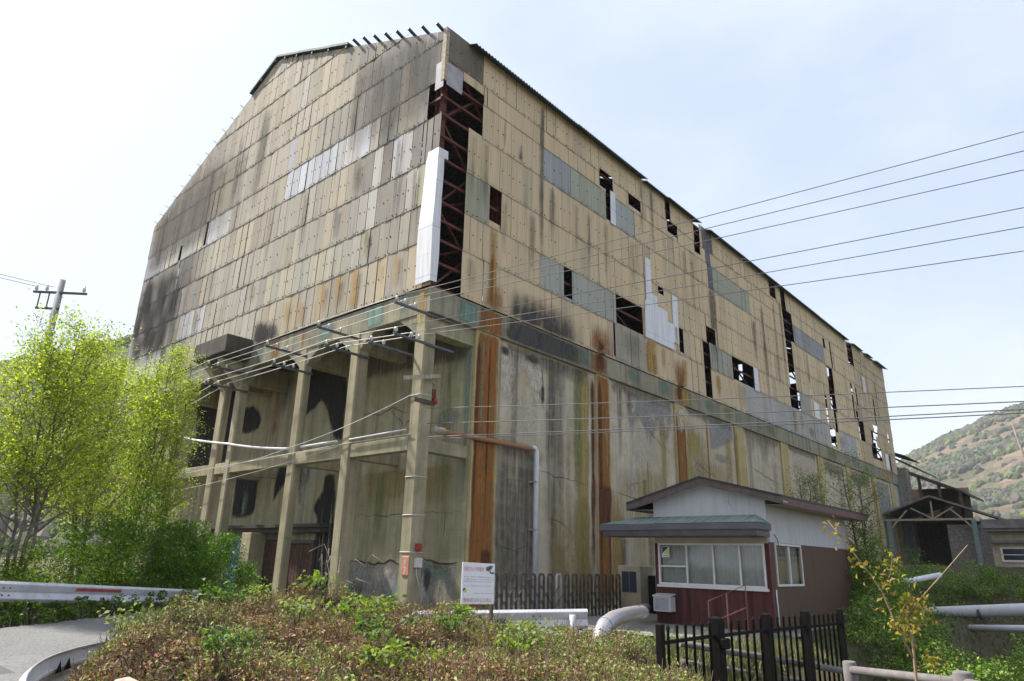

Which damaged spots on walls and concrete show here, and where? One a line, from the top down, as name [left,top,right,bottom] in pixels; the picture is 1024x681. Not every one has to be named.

water stain [132,272,177,358]
water stain [253,323,275,355]
rust [469,232,502,564]
water stain [507,300,587,469]
rust [648,340,665,373]
rust [676,364,690,406]
rust [575,331,623,603]
rust [676,419,710,482]
peeling [347,561,398,601]
peeling [419,562,457,610]